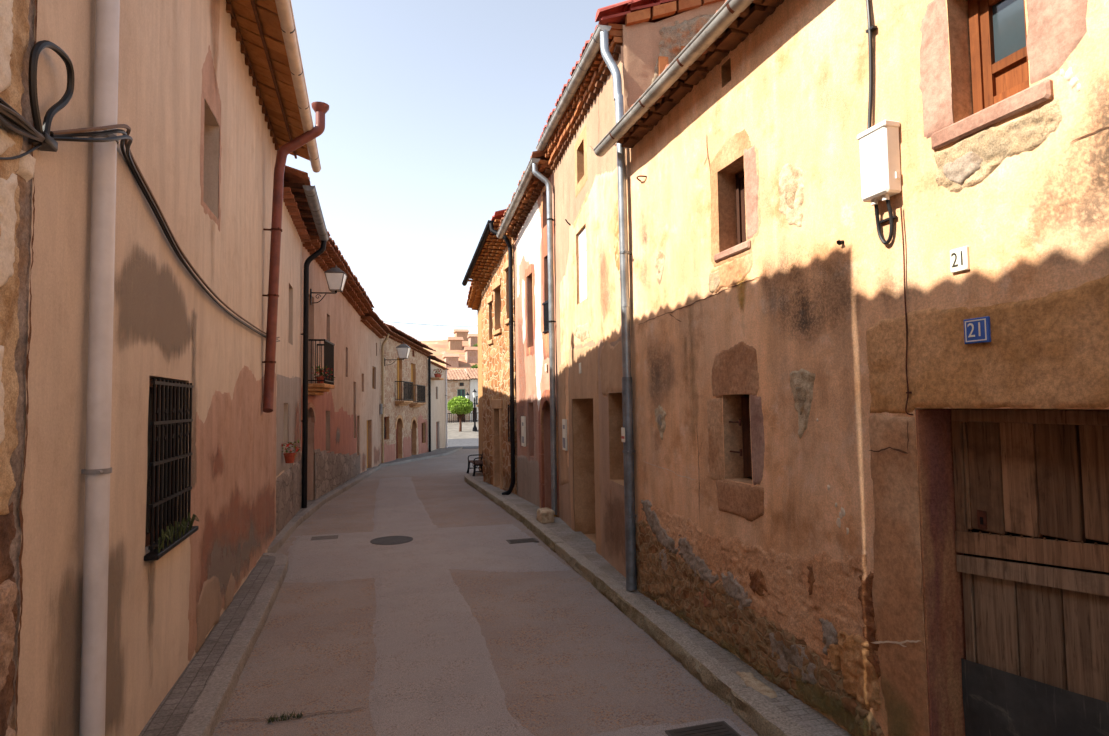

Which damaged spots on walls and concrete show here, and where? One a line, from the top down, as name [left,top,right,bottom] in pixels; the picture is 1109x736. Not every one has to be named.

spalling [934,98,1063,193]
flaking render [778,163,804,227]
flaking render [790,369,818,438]
flaking render [635,499,885,736]